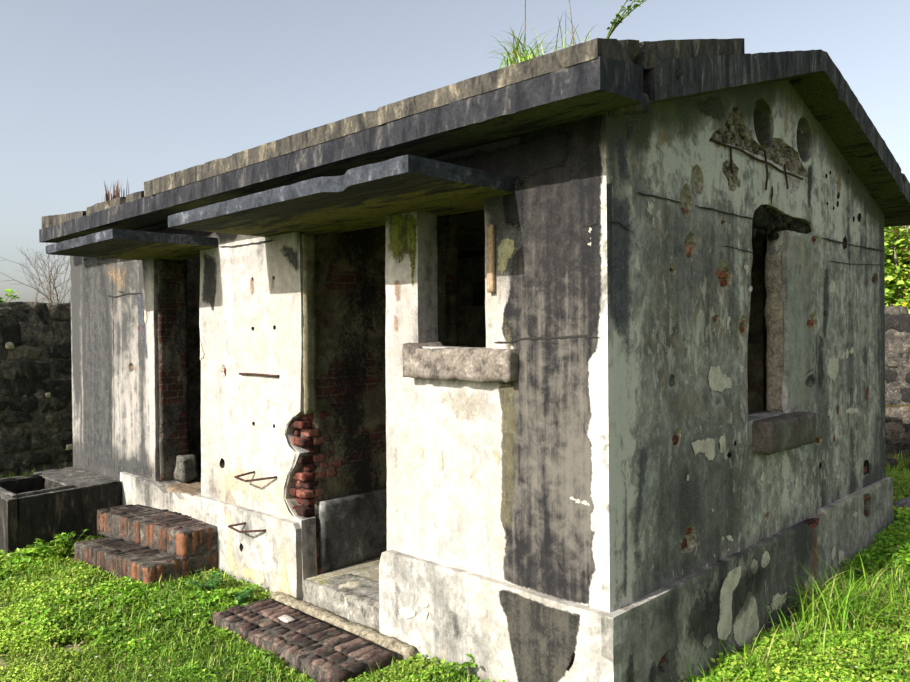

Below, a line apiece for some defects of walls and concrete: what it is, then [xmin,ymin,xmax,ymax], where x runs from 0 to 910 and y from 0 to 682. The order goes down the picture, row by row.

spalling [710,105,808,195]
damp [148,226,213,237]
damp [388,214,418,286]
damp [73,256,152,478]
damp [442,115,633,682]
peeling [708,366,732,393]
peeling [691,435,736,460]
peeling [703,551,787,649]